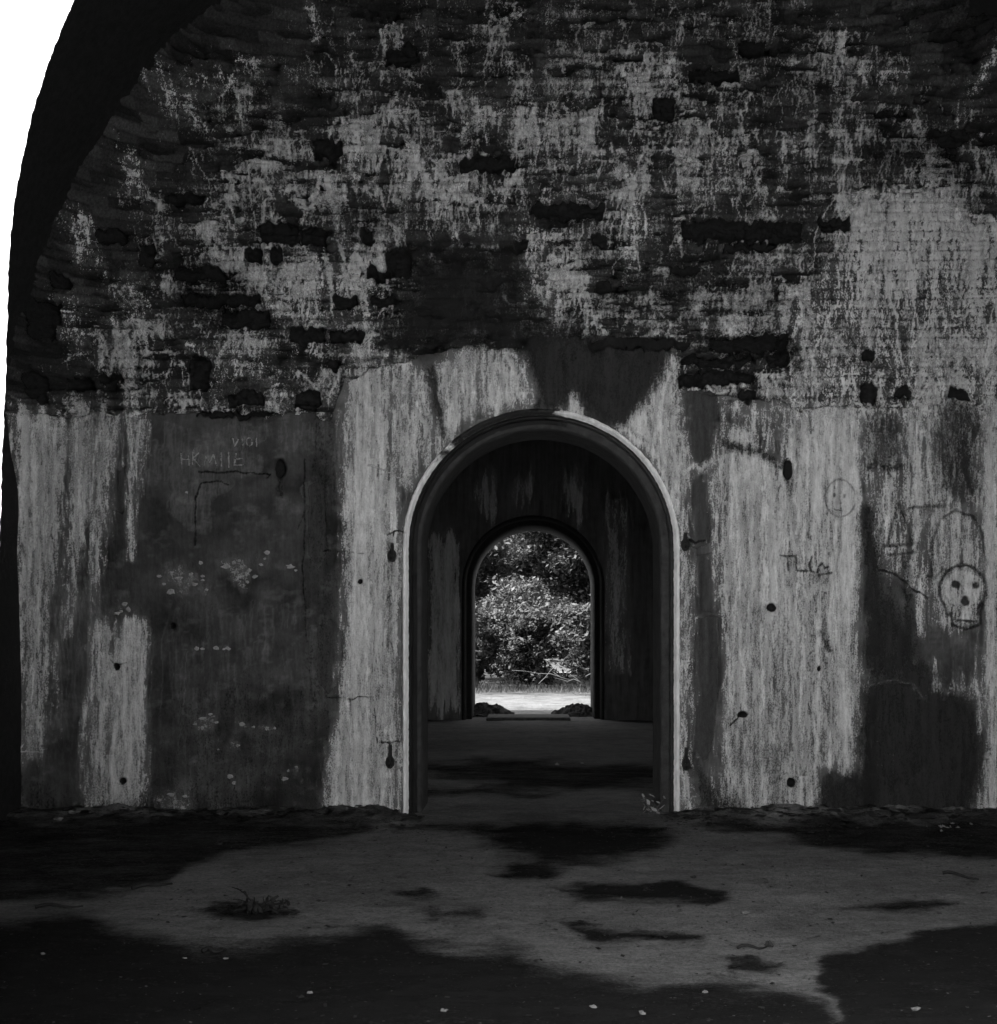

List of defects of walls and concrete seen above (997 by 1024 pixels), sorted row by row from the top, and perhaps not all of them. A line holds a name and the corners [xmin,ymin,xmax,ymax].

spalling [459,153,516,175]
spalling [244,222,328,266]
spalling [531,201,607,249]
spalling [681,217,802,254]
spalling [817,216,851,234]
spalling [174,264,271,331]
spalling [332,248,412,311]
spalling [289,325,366,348]
spalling [859,382,878,406]
spalling [947,386,970,402]
water stain [0,21,910,900]
water stain [616,147,997,860]